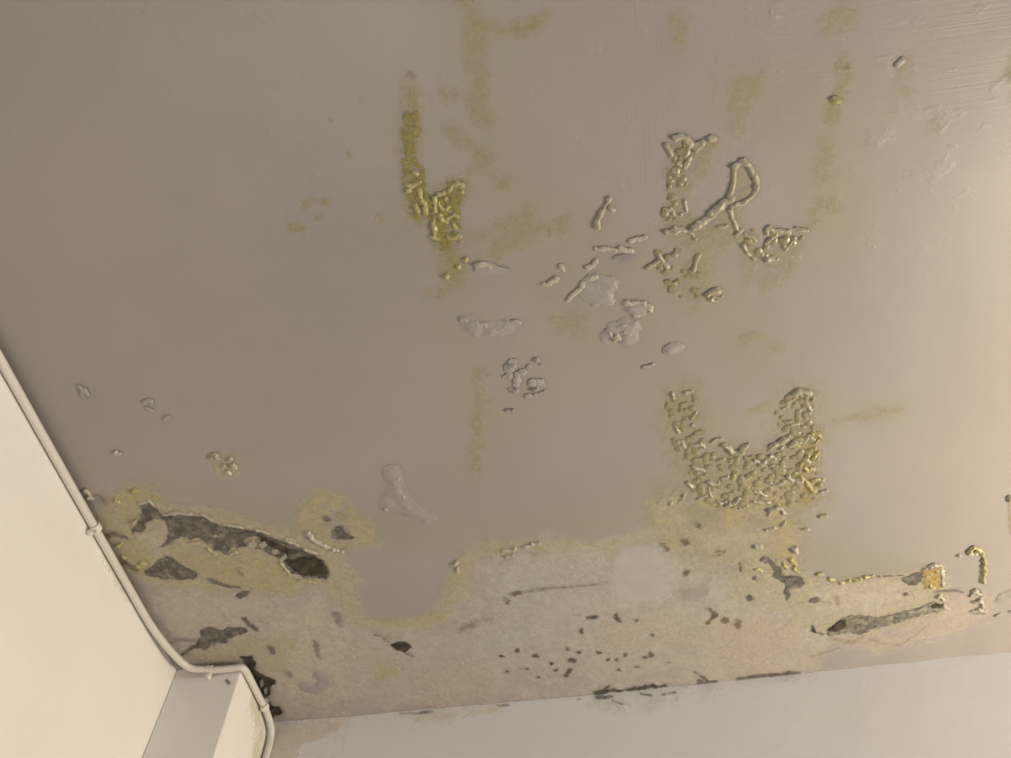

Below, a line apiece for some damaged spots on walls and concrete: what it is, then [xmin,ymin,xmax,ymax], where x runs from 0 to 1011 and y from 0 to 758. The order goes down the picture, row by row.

water stain [400,82,469,296]
peeling [566,235,648,308]
spalling [132,499,355,599]
water stain [82,368,989,758]
peeling [957,546,988,615]
spalling [172,617,258,656]
spalling [373,634,415,658]
spalling [241,656,283,718]